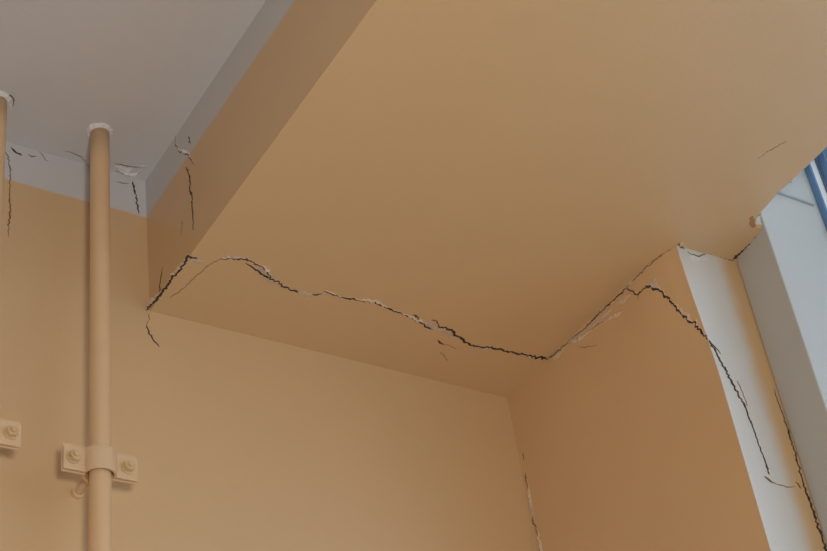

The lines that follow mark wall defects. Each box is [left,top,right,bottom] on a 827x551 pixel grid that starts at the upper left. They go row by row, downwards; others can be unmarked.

crack [87,123,113,137]
crack [5,147,49,237]
crack [175,136,194,233]
crack [146,237,827,551]